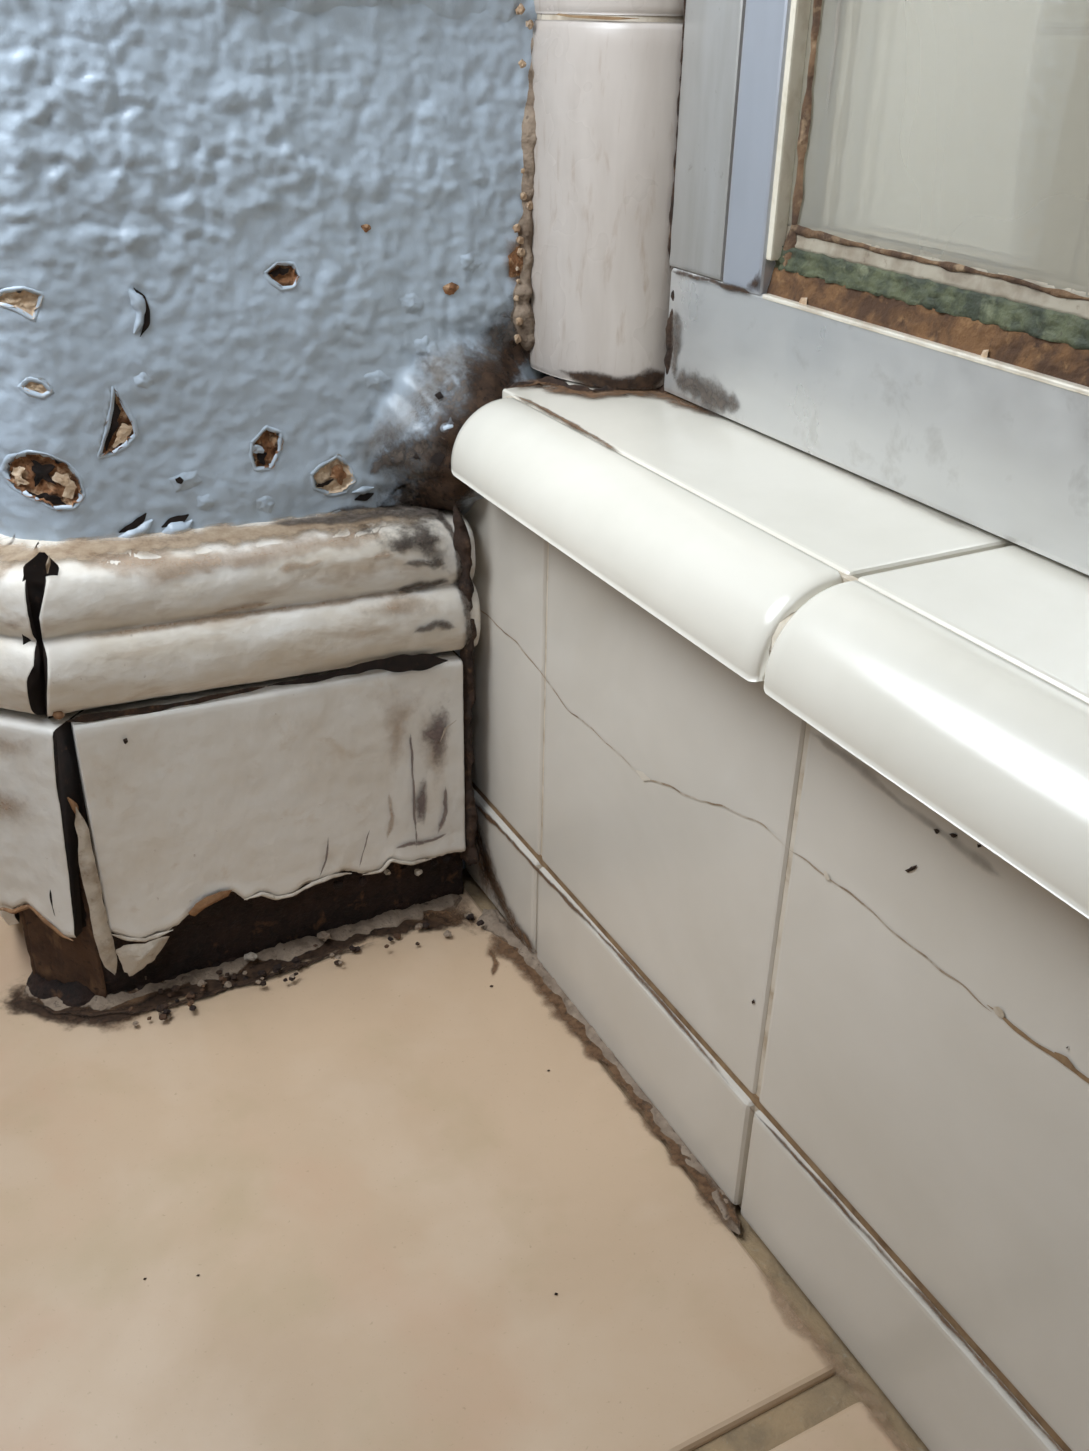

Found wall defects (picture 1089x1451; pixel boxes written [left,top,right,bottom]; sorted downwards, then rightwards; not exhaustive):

peeling [0,286,45,322]
peeling [263,261,302,292]
peeling [18,377,54,399]
peeling [0,450,86,511]
peeling [97,386,140,459]
peeling [249,425,283,472]
leakage [0,298,614,646]
peeling [310,454,357,497]
crack [22,552,65,720]
crack [49,797,105,928]
peeling [75,807,173,976]
crack [480,609,1089,1084]